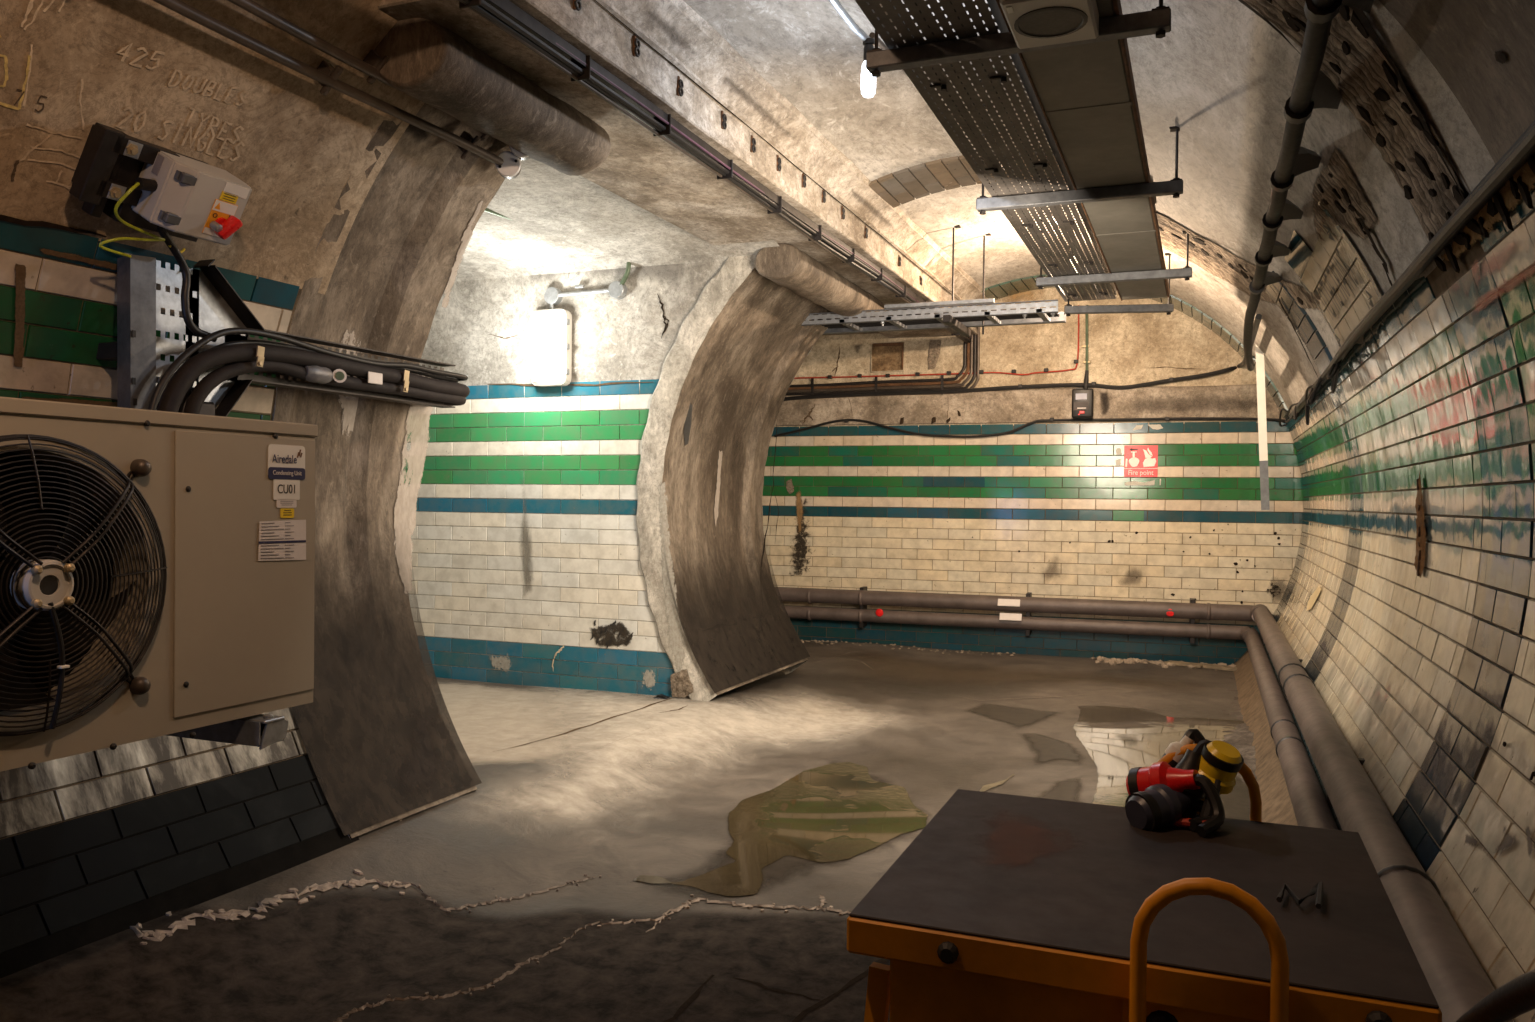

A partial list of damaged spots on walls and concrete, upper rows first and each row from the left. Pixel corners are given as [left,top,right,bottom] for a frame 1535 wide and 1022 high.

spalling [1243,0,1307,48]
spalling [1311,5,1535,274]
leakage [789,499,811,576]
crack [663,975,714,1022]